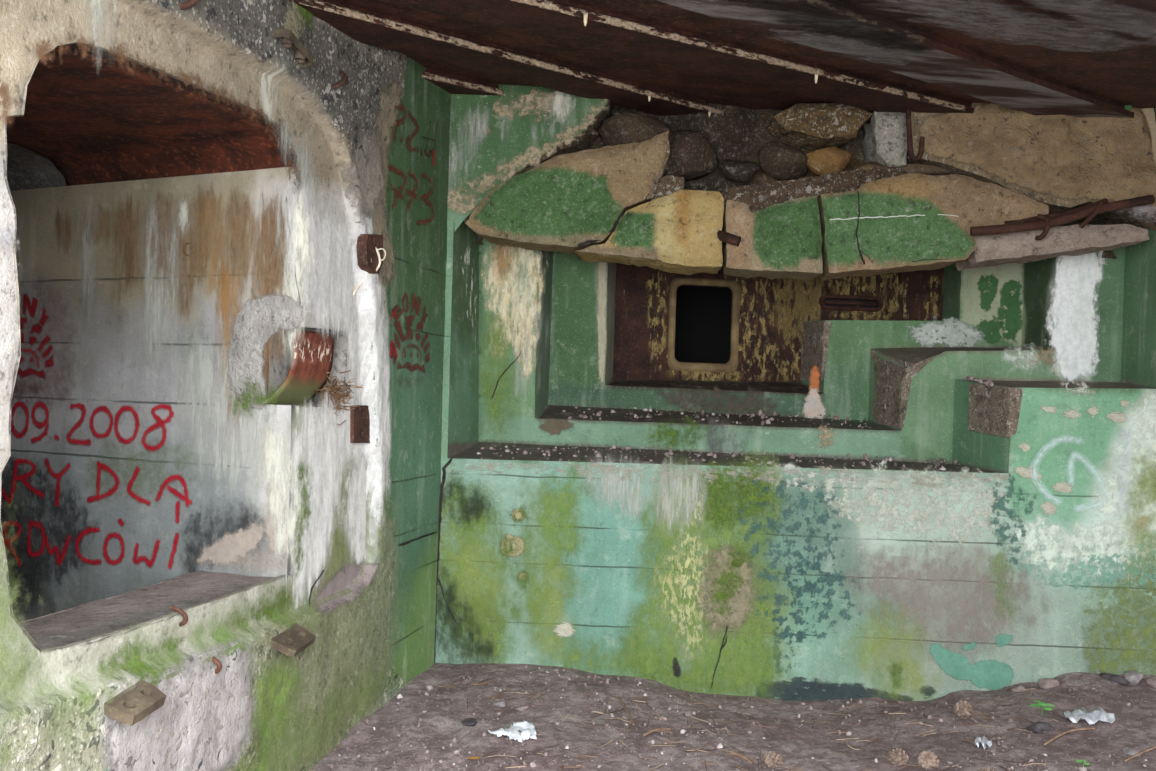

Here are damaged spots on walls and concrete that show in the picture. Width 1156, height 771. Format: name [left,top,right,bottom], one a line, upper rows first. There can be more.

rust [0,80,11,122]
rust [36,35,300,185]
water stain [261,68,283,119]
water stain [511,0,965,112]
water stain [675,0,1156,65]
water stain [145,202,187,357]
rust [85,193,290,409]
crack [578,212,624,246]
crack [855,191,873,265]
water stain [180,126,391,610]
water stain [1,460,88,591]
crack [710,626,728,690]